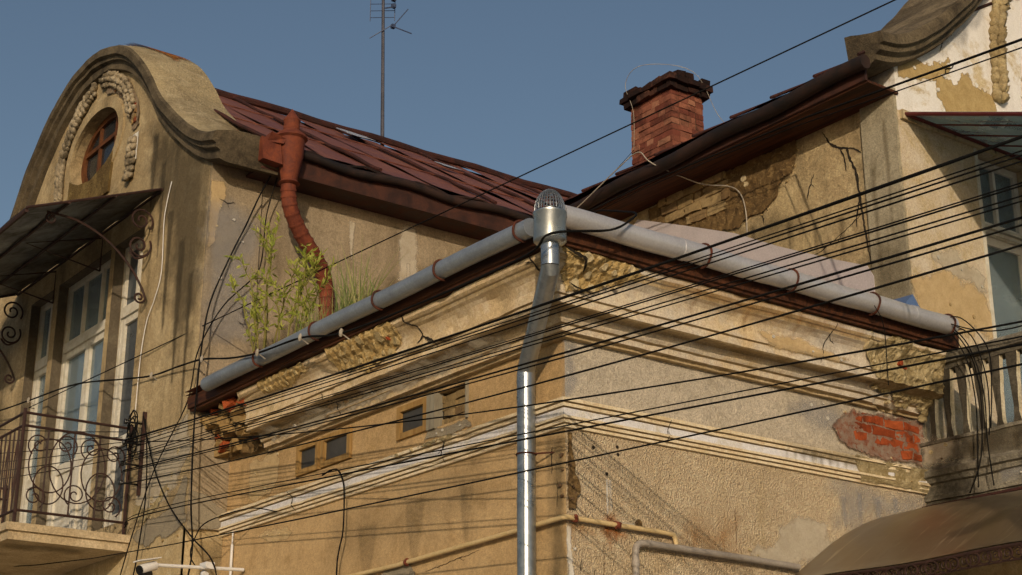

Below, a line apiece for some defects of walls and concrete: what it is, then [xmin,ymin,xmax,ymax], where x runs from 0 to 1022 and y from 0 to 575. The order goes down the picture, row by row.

peeling [898,57,997,112]
flaking render [648,140,798,233]
crack [814,133,872,266]
leakage [151,134,204,407]
flaking render [560,246,641,294]
flaking render [324,321,402,373]
flaking render [200,338,510,502]
flaking render [826,332,959,493]
peeling [132,414,190,523]
peeling [176,491,227,537]
flaking render [558,432,581,509]